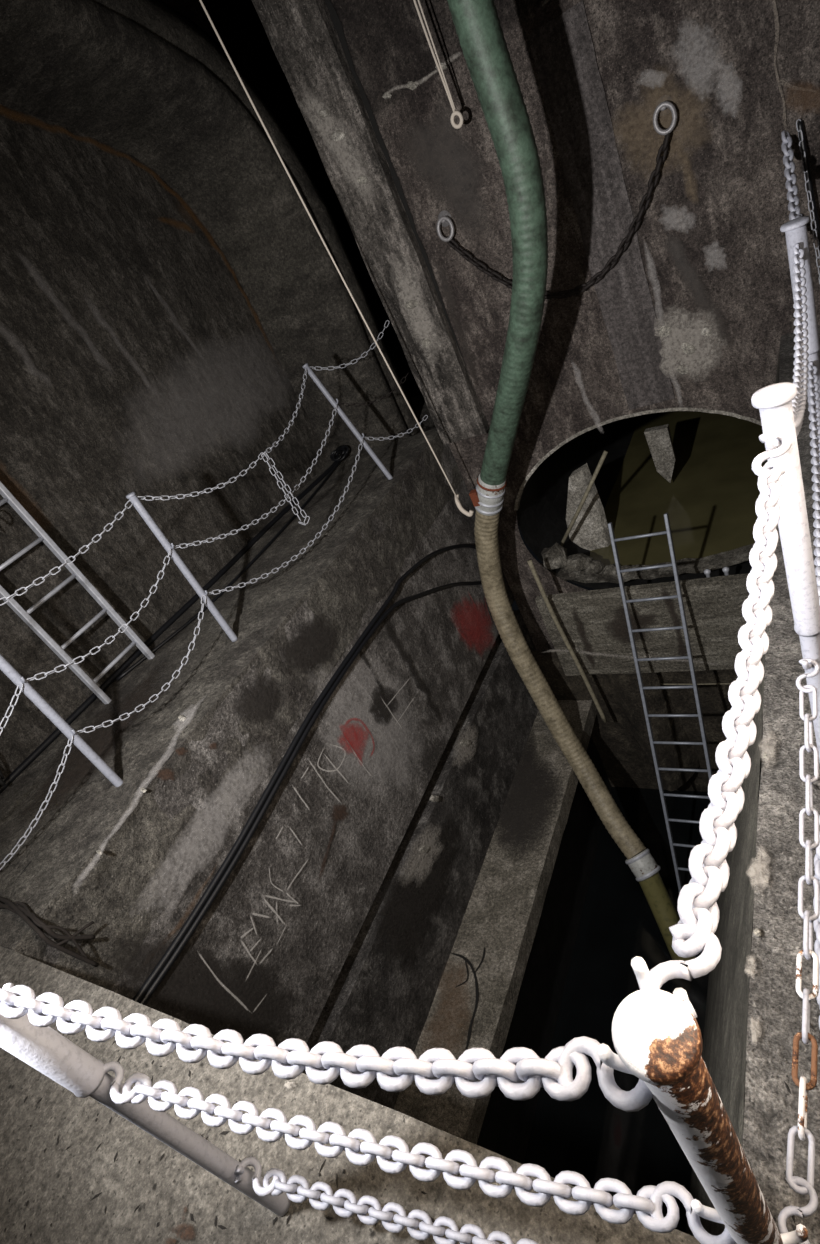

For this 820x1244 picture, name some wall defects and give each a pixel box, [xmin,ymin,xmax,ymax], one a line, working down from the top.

corrosion [619,81,701,199]